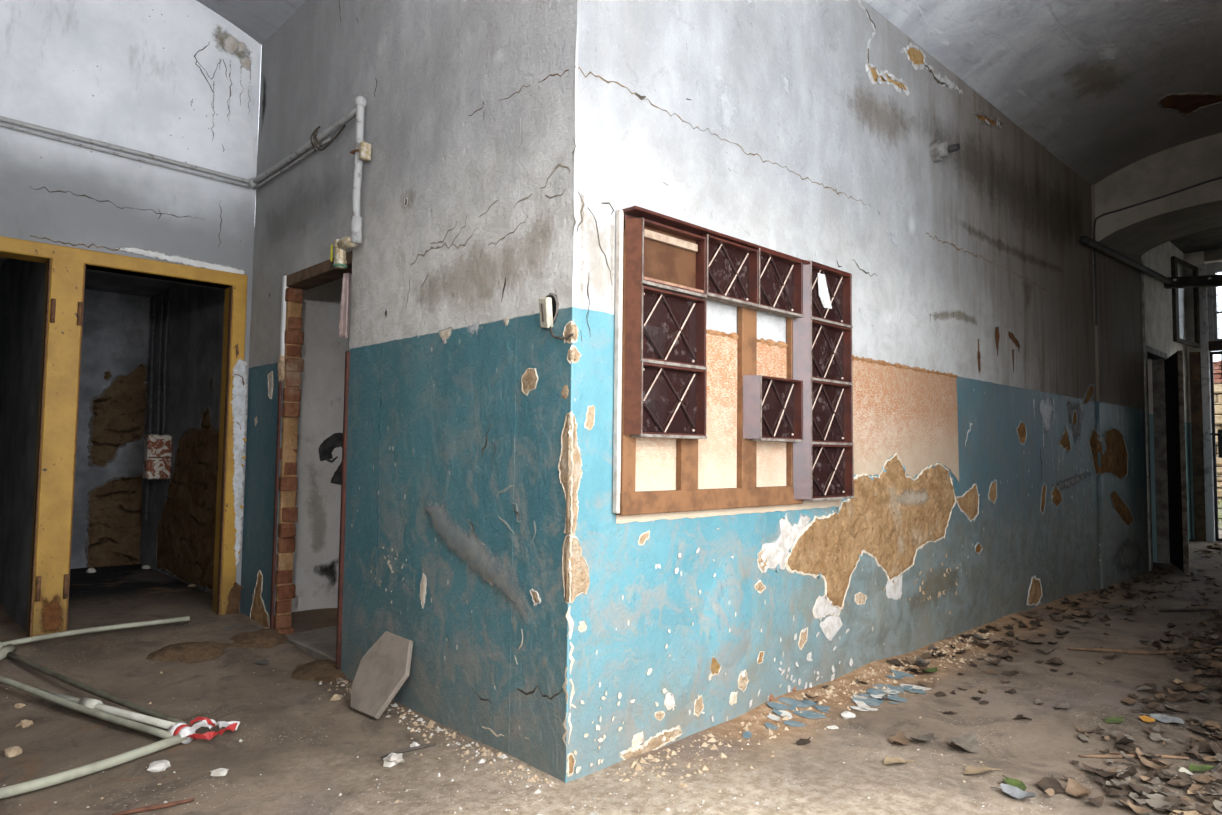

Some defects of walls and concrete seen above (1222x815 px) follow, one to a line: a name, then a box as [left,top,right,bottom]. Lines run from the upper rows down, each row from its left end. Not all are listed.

crack [191,41,250,151]
crack [468,66,880,215]
flaking render [865,63,910,96]
flaking render [904,42,963,94]
crack [29,186,222,245]
crack [406,140,614,339]
peeling [521,368,538,396]
flaking render [85,361,148,568]
flaking render [156,343,258,594]
flaking render [1088,426,1134,527]
flaking render [558,385,683,777]
flaking render [709,453,997,729]